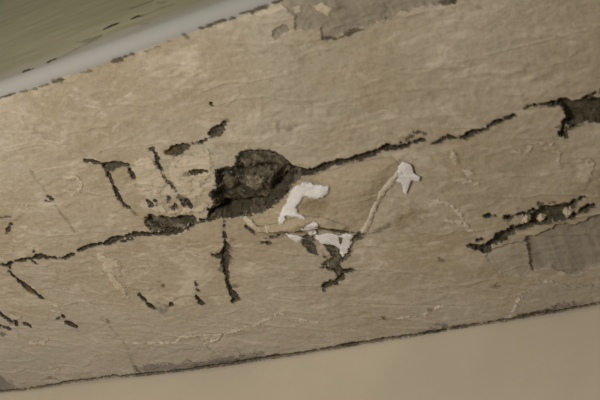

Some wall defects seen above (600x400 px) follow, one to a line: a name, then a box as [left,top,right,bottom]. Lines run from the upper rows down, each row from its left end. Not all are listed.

spalling [272,0,457,42]
crack [301,114,515,175]
spalling [511,90,600,173]
crack [1,119,240,305]
spalling [131,148,312,233]
crack [244,224,389,292]
spalling [466,196,600,277]
crack [137,292,156,309]